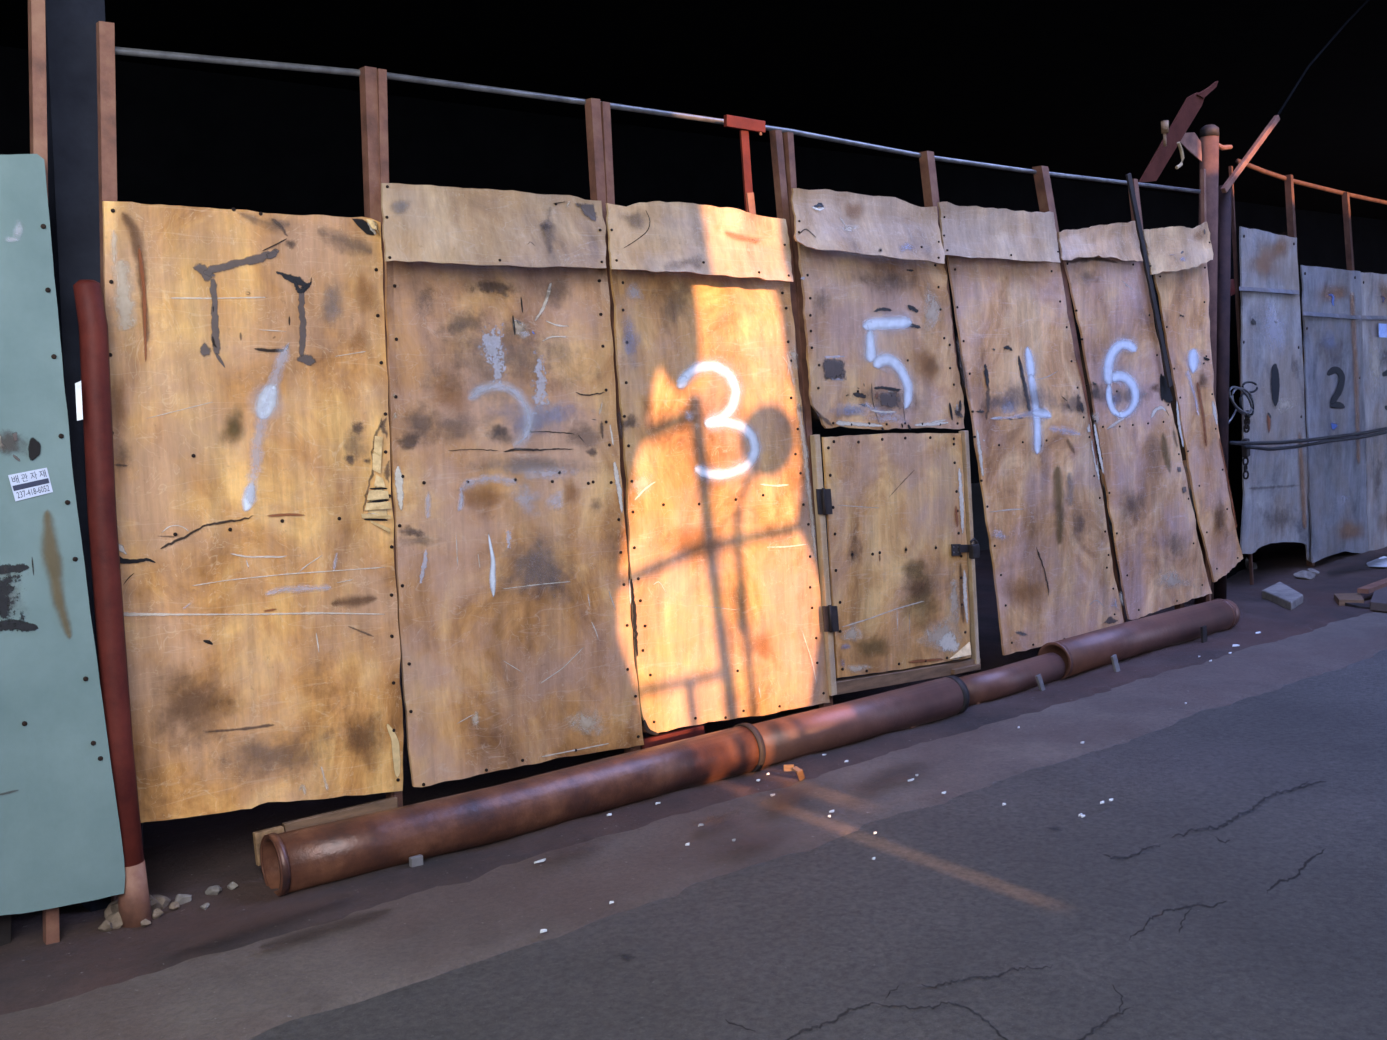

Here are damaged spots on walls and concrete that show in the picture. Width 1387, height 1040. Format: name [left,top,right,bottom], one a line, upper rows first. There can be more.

crack [1104,781,1324,859]
crack [1267,850,1323,893]
crack [1130,901,1226,938]
crack [787,966,1052,1040]
crack [1079,986,1128,1040]